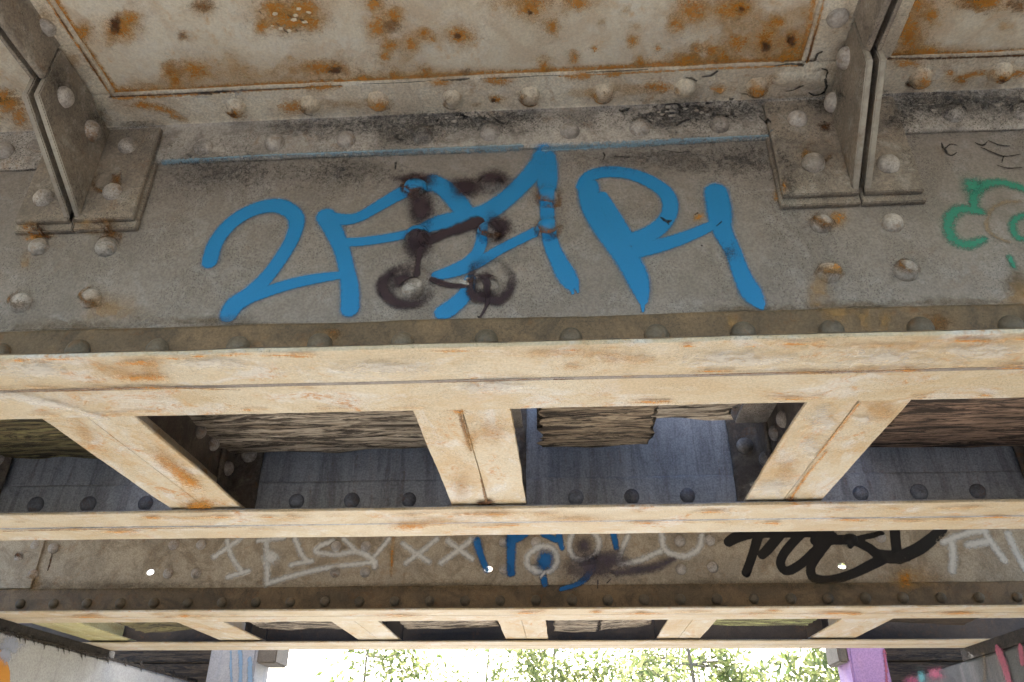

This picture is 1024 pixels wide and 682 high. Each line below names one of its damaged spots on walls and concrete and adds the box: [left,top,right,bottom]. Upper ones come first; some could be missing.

rust [47,0,825,120]
rust [887,0,1024,89]
rust [0,91,27,126]
rust [23,360,234,392]
rust [691,368,938,376]